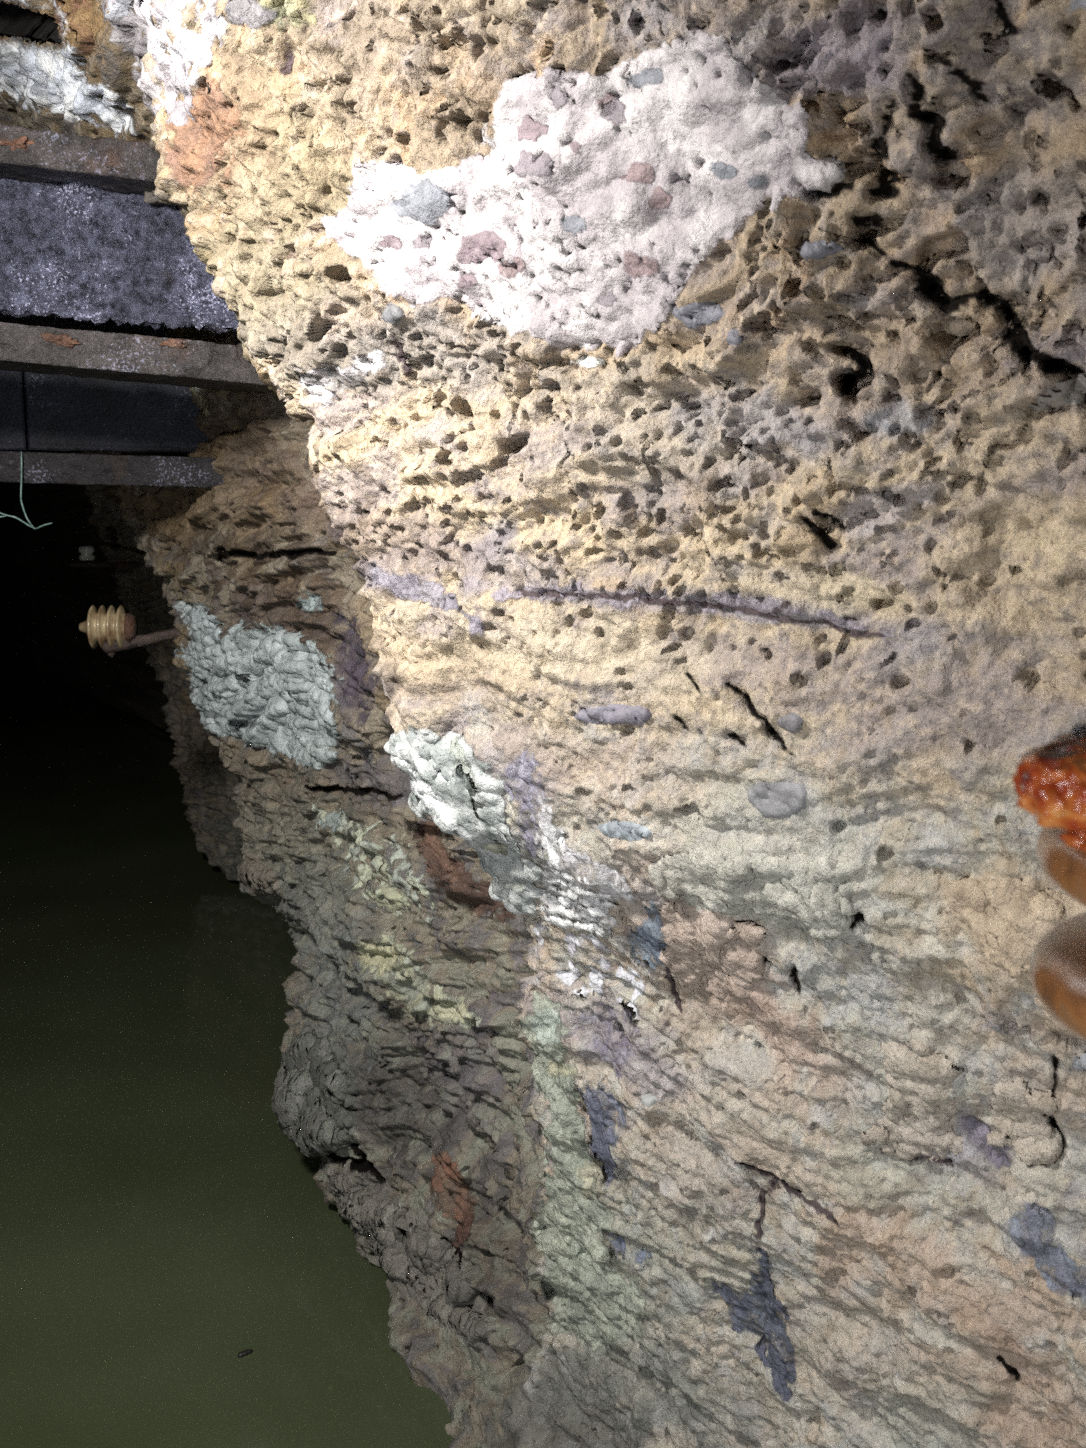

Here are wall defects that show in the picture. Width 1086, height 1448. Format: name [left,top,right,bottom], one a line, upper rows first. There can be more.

crack [992,2,1017,38]
spalling [321,29,847,358]
crack [803,53,1086,415]
crack [213,547,337,563]
leakage [168,592,375,770]
leakage [303,804,434,928]
leakage [383,726,548,945]
rust [1058,830,1086,852]
leakage [354,933,482,1029]
leakage [518,900,669,1353]
crack [1027,1055,1065,1168]
crack [734,1162,838,1239]